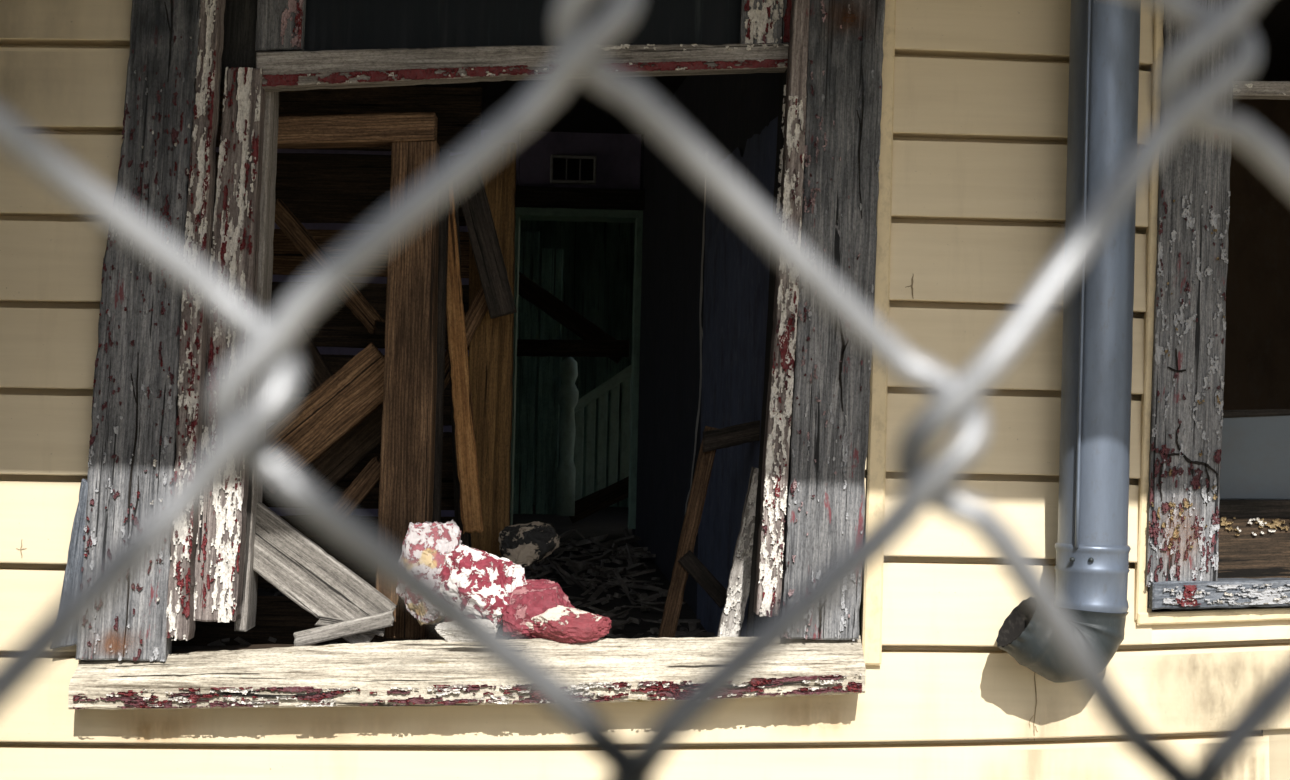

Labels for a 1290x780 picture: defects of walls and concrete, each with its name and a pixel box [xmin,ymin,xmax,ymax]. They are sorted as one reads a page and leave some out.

peeling [119,0,546,304]
peeling [776,60,861,271]
peeling [81,231,245,572]
peeling [87,465,244,662]
peeling [73,684,541,709]
peeling [571,681,693,702]
peeling [719,265,849,637]
peeling [725,674,862,698]
peeling [835,591,855,641]
crack [1152,424,1219,506]
peeling [1147,189,1290,607]